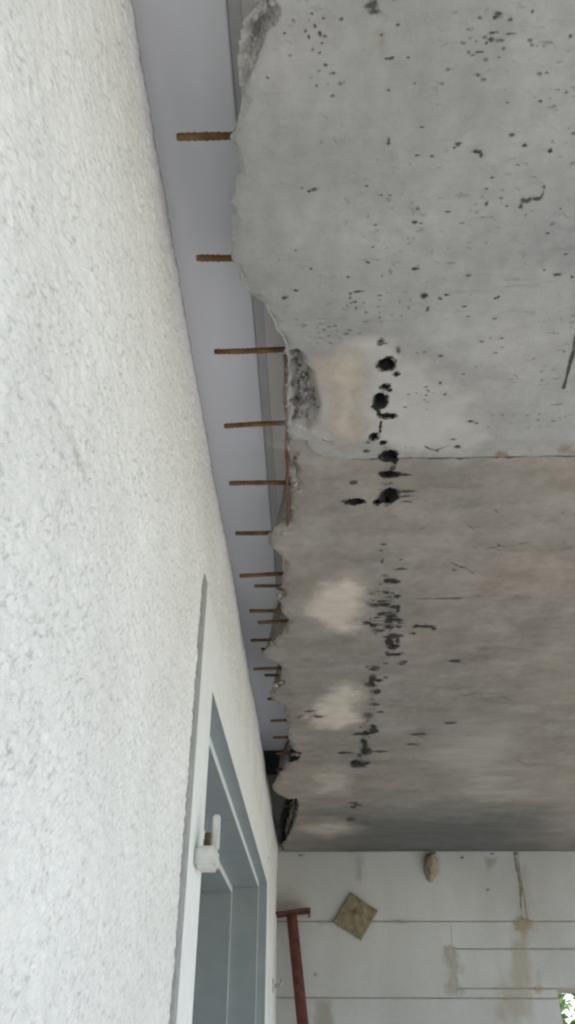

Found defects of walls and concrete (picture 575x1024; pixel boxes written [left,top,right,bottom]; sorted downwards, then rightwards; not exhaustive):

spalling [237,0,286,86]
spalling [214,346,320,786]
spalling [279,798,299,844]